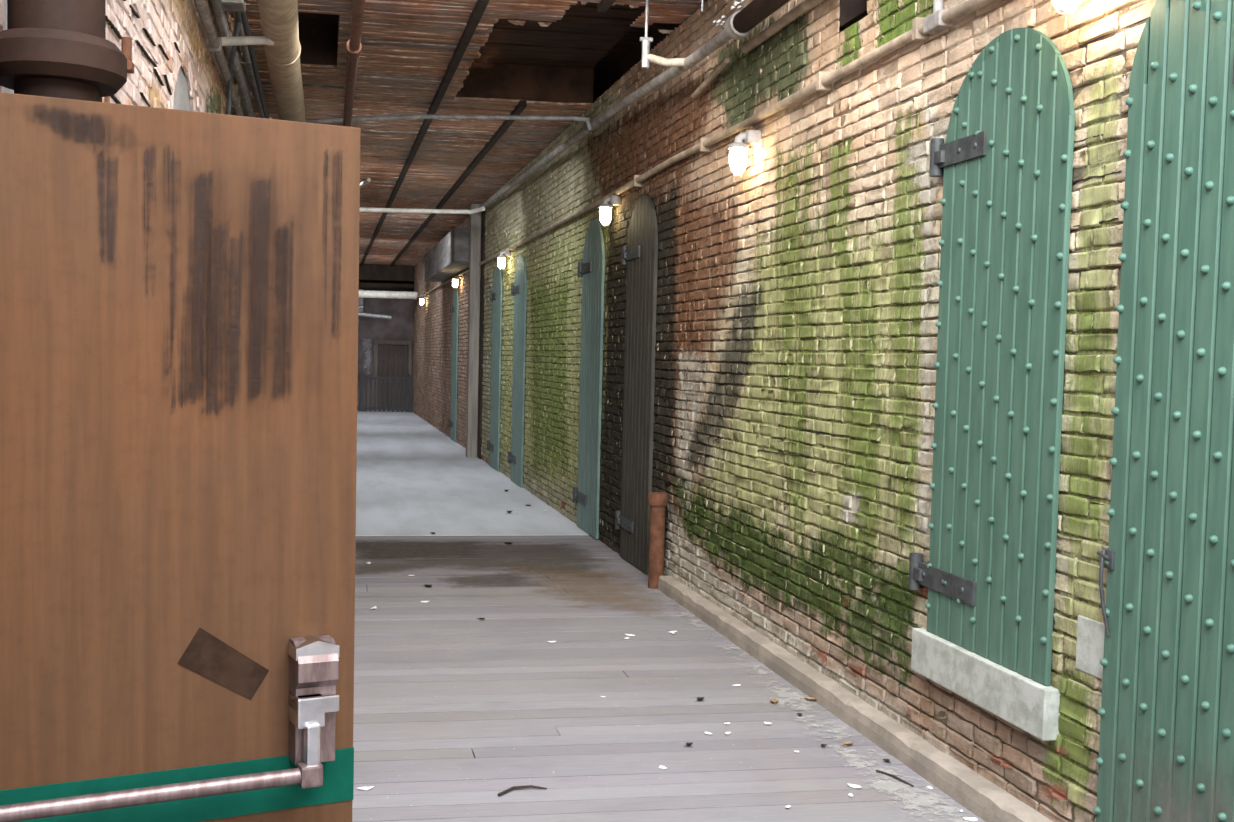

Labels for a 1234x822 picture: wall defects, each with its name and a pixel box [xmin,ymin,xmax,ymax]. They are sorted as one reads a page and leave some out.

leakage [531,275,568,475]
leakage [598,184,954,758]
leakage [775,110,927,557]
leakage [740,665,968,822]